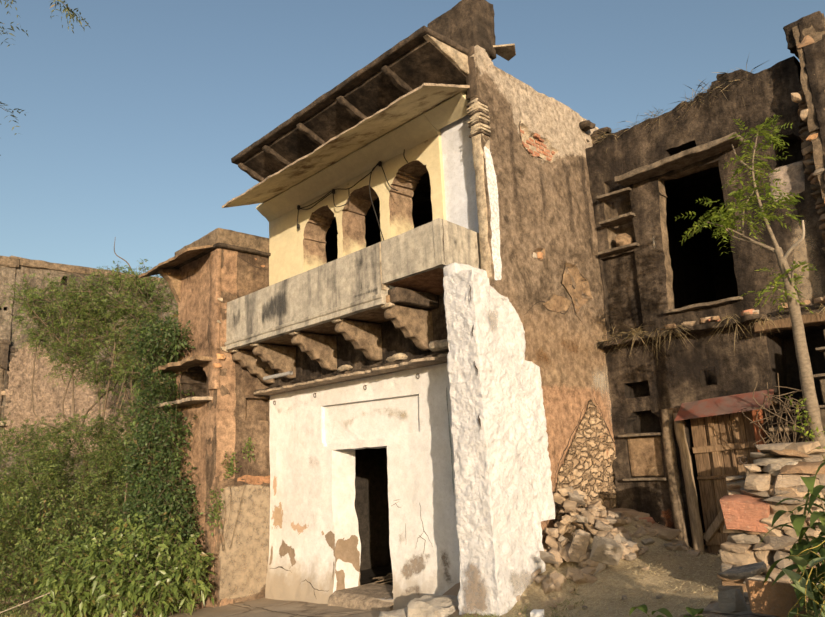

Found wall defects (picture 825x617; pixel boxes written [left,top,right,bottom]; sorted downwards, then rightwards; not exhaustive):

spalling [519,121,559,163]
spalling [532,248,545,260]
leakage [262,294,286,322]
spalling [524,262,592,325]
spalling [553,396,618,528]
peeling [219,475,309,599]
crack [244,556,329,617]
spalling [322,531,360,591]